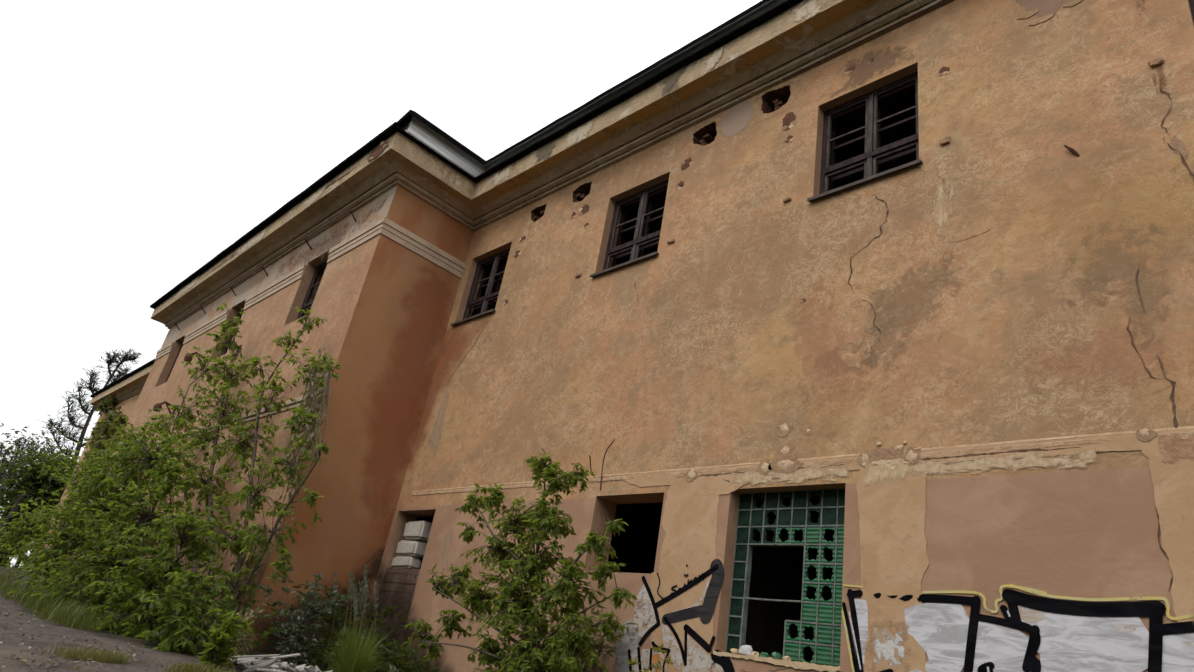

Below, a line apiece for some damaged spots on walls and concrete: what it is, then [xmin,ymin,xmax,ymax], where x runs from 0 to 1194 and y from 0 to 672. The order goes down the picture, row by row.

spalling [513,198,550,258]
spalling [566,175,597,229]
spalling [675,114,723,190]
spalling [754,75,797,143]
crack [848,195,889,340]
crack [1160,77,1194,181]
crack [1126,265,1186,440]
peeling [618,428,1194,672]